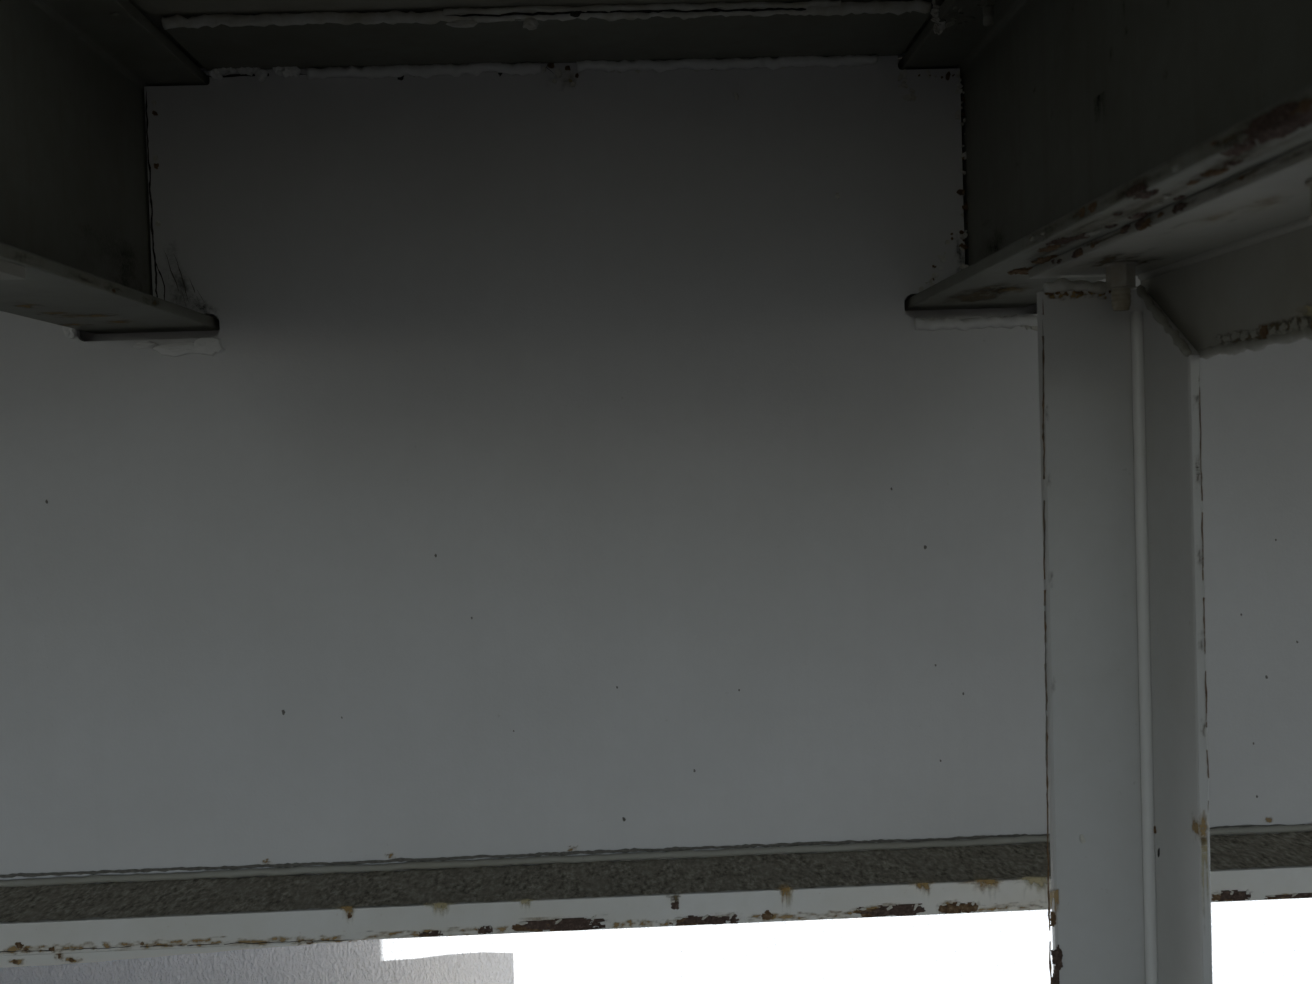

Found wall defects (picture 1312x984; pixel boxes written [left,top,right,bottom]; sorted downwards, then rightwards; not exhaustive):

rust [1231,97,1312,145]
rust [1042,290,1112,479]
rust [1022,500,1063,984]
rust [0,896,804,965]
rust [835,879,1032,918]
rust [1192,816,1312,902]